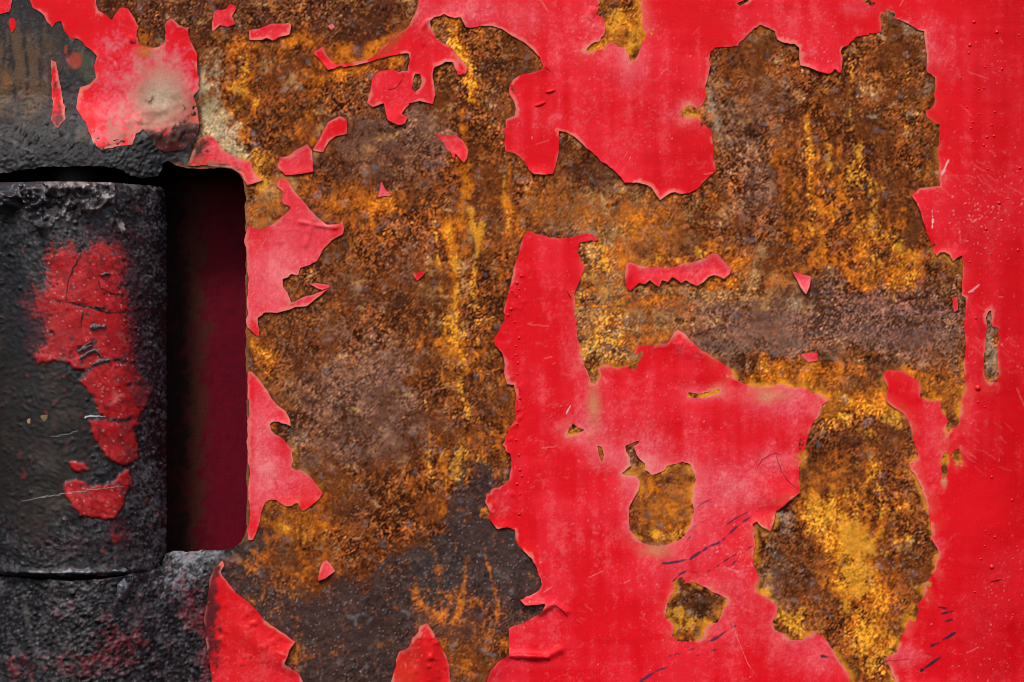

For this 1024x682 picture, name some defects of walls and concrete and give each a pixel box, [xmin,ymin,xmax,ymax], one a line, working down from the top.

peeling [407,69,422,91]
corrosion [98,0,583,595]
peeling [78,323,110,365]
corrosion [568,0,966,682]
peeling [984,311,999,382]
peeling [688,384,720,399]
peeling [204,561,303,682]
peeling [391,624,450,682]
corrosion [440,635,509,682]